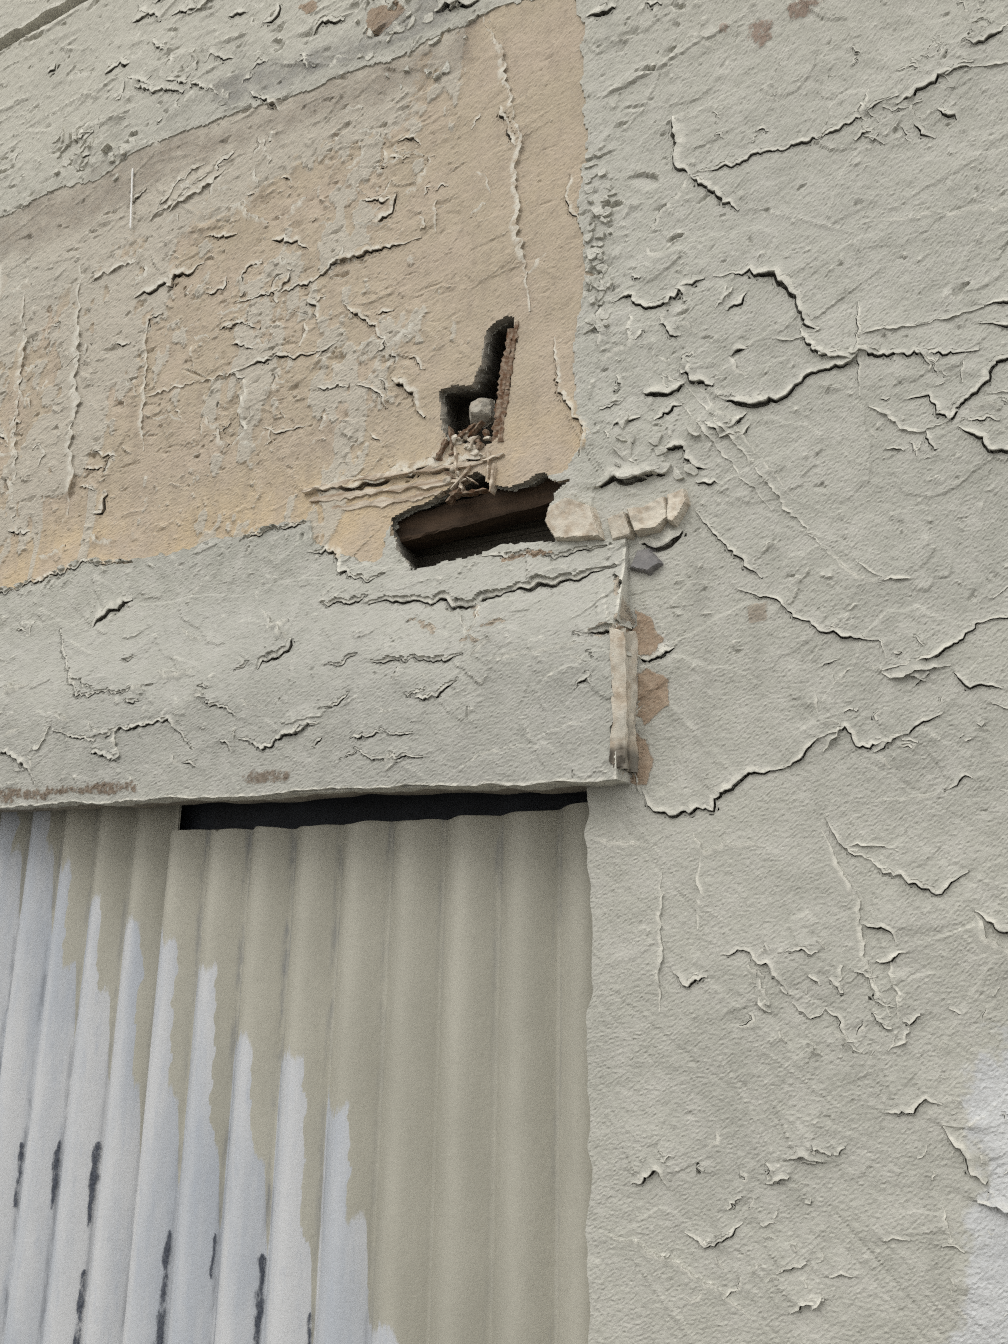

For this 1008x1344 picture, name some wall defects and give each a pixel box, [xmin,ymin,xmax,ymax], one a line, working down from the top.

peeling [0,0,750,785]
crack [0,0,1008,729]
crack [0,553,318,784]
crack [350,729,423,762]
crack [594,711,941,1055]
crack [820,816,969,1020]
crack [973,910,1008,961]
peeling [50,1140,61,1209]
peeling [87,1142,101,1227]
peeling [73,1269,86,1344]
peeling [153,1230,171,1344]
peeling [253,1254,266,1344]